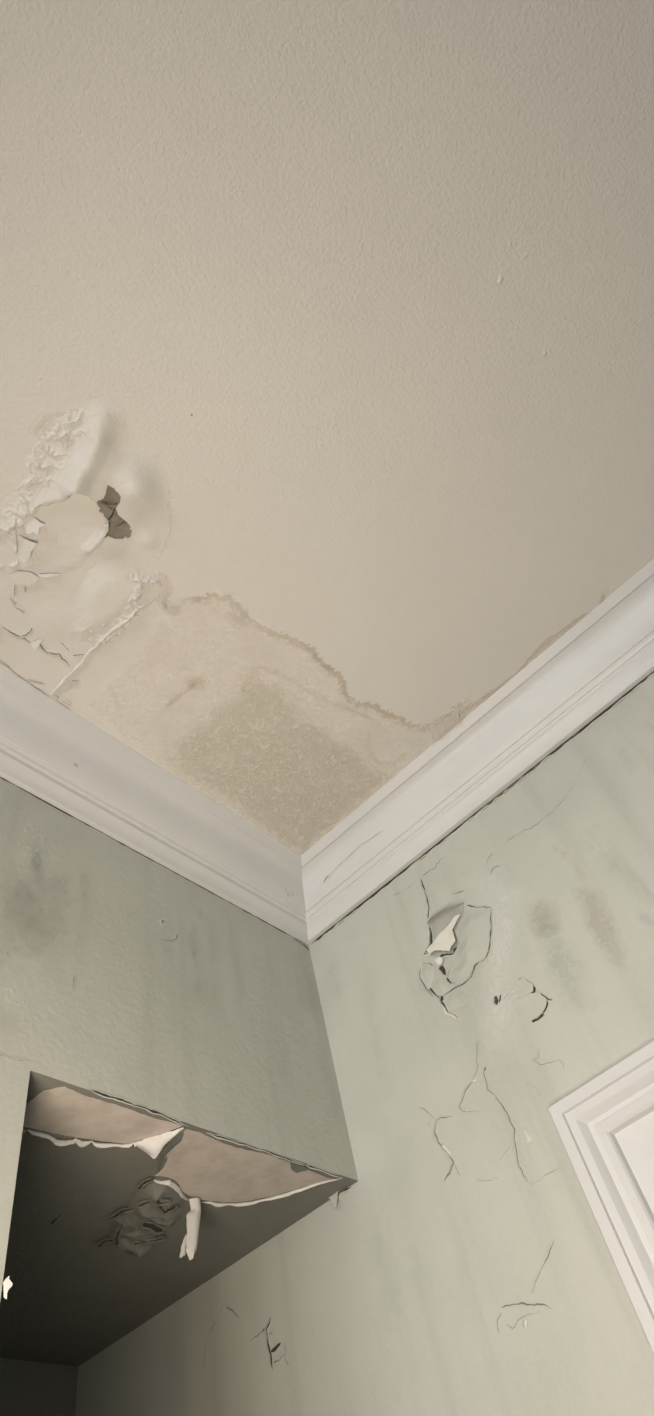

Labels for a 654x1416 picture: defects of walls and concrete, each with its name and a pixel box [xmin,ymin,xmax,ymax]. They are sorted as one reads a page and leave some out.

peeling [0,661,71,709]
water stain [156,632,384,851]
peeling [417,878,493,1019]
peeling [493,977,553,1024]
peeling [22,1087,351,1260]
crack [419,1042,565,1187]
crack [495,1238,555,1334]